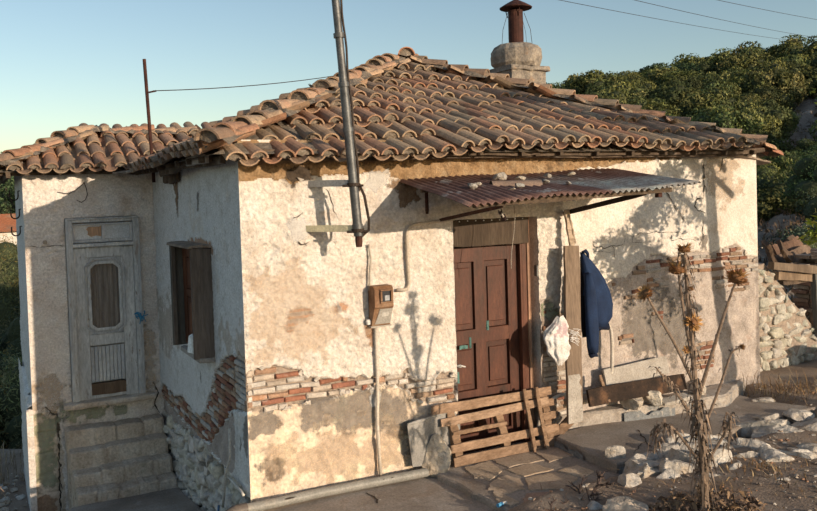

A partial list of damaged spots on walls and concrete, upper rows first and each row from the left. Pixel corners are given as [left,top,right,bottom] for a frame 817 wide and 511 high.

flaking render [238,157,681,187]
crack [593,158,725,257]
flaking render [540,244,760,424]
crack [45,407,63,511]
damp [243,410,281,457]
flaking render [161,352,460,511]
damp [299,386,415,456]